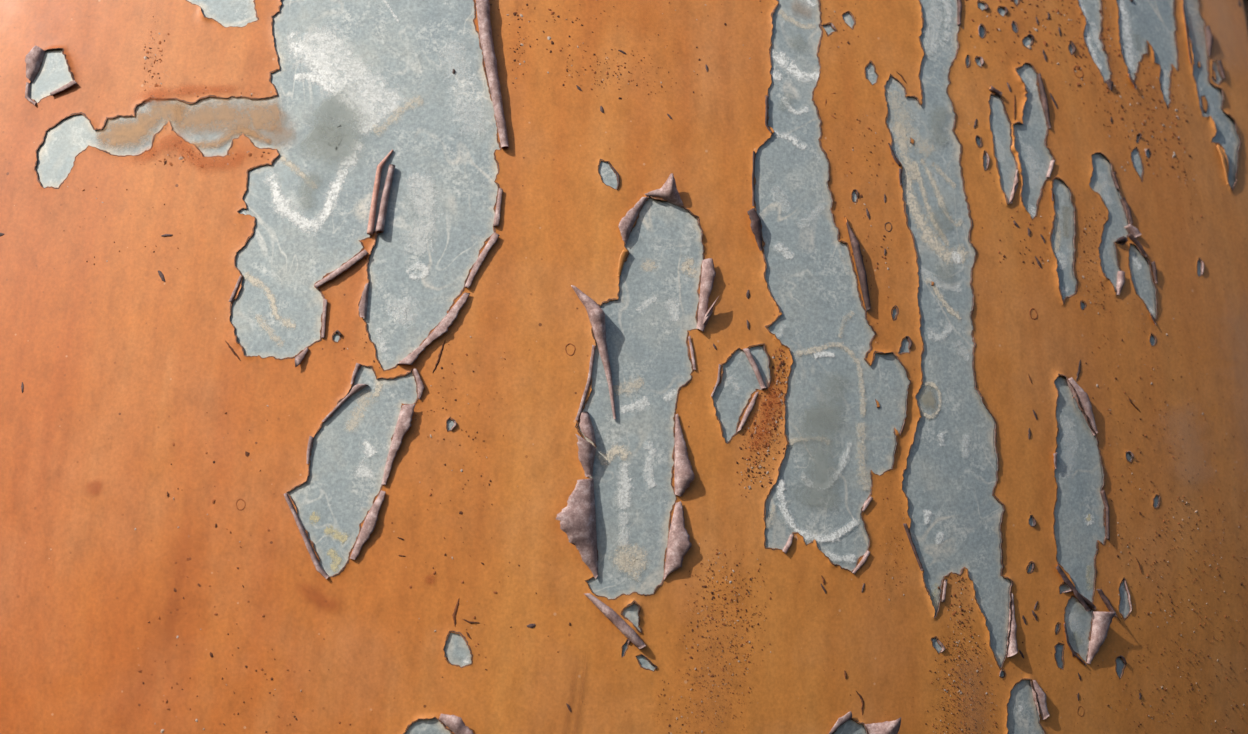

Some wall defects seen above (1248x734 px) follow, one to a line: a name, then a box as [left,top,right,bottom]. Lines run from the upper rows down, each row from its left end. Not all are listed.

peeling [25,45,77,105]
corrosion [144,16,226,101]
corrosion [492,4,676,99]
corrosion [962,0,1202,232]
peeling [1068,0,1241,191]
peeling [34,0,509,579]
peeling [556,173,719,658]
corrosion [736,339,788,497]
peeling [711,0,1087,734]
peeling [1053,374,1132,670]
corrosion [650,540,772,734]
corrosion [925,570,1005,734]